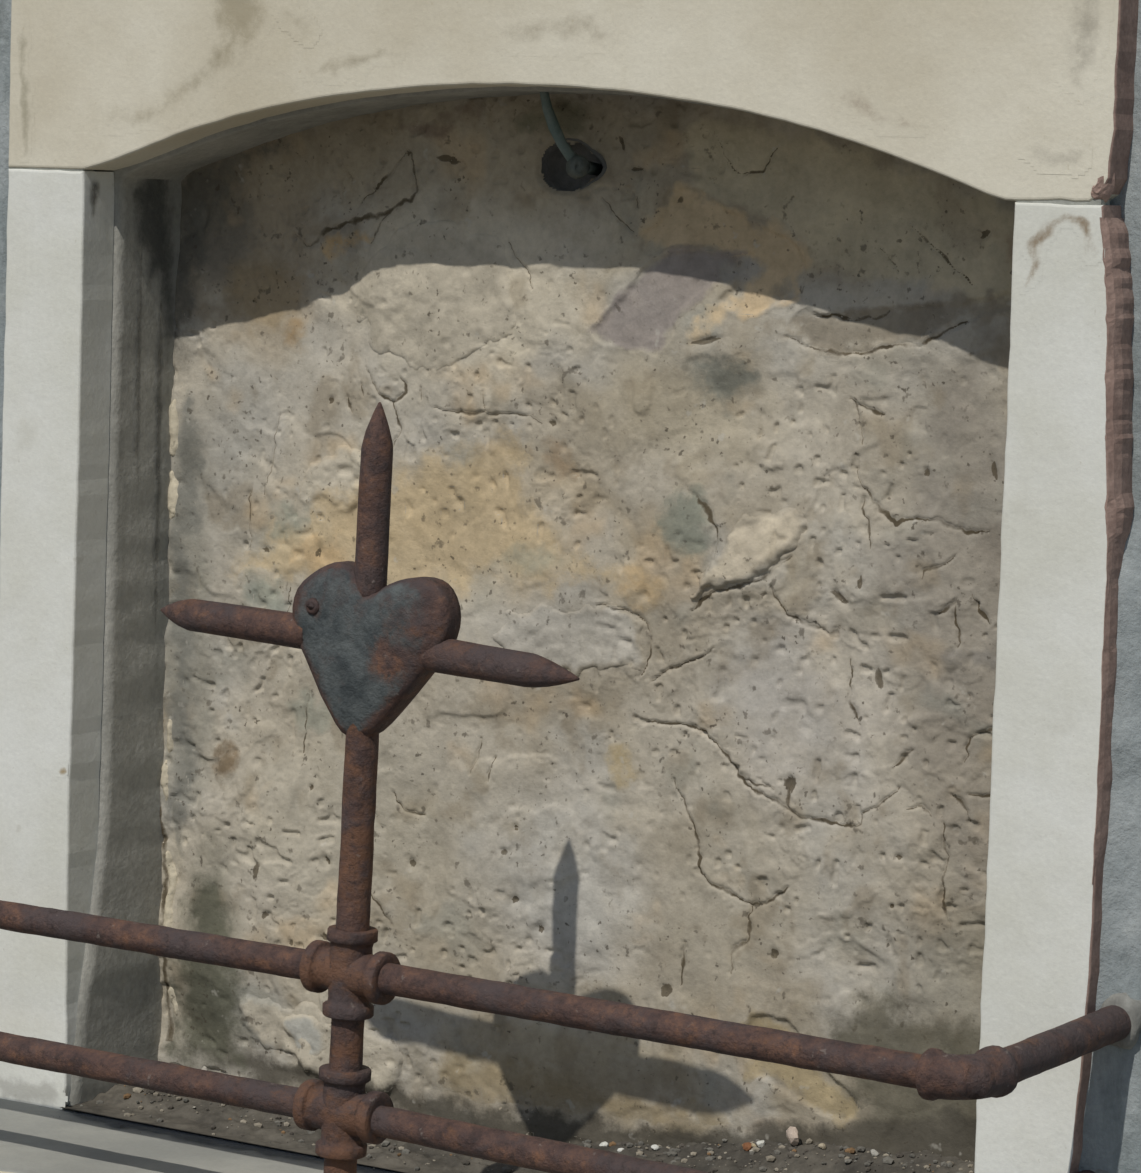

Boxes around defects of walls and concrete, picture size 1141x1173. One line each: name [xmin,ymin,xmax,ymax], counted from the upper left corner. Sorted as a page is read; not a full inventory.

crack [295,149,419,247]
rust [988,207,1105,295]
damp [138,127,381,604]
crack [687,488,719,559]
crack [852,398,990,579]
crack [691,556,824,630]
damp [161,619,245,860]
crack [674,779,788,974]
crack [648,720,993,929]
damp [210,1038,320,1087]
damp [365,1030,977,1162]
damp [806,977,981,1055]